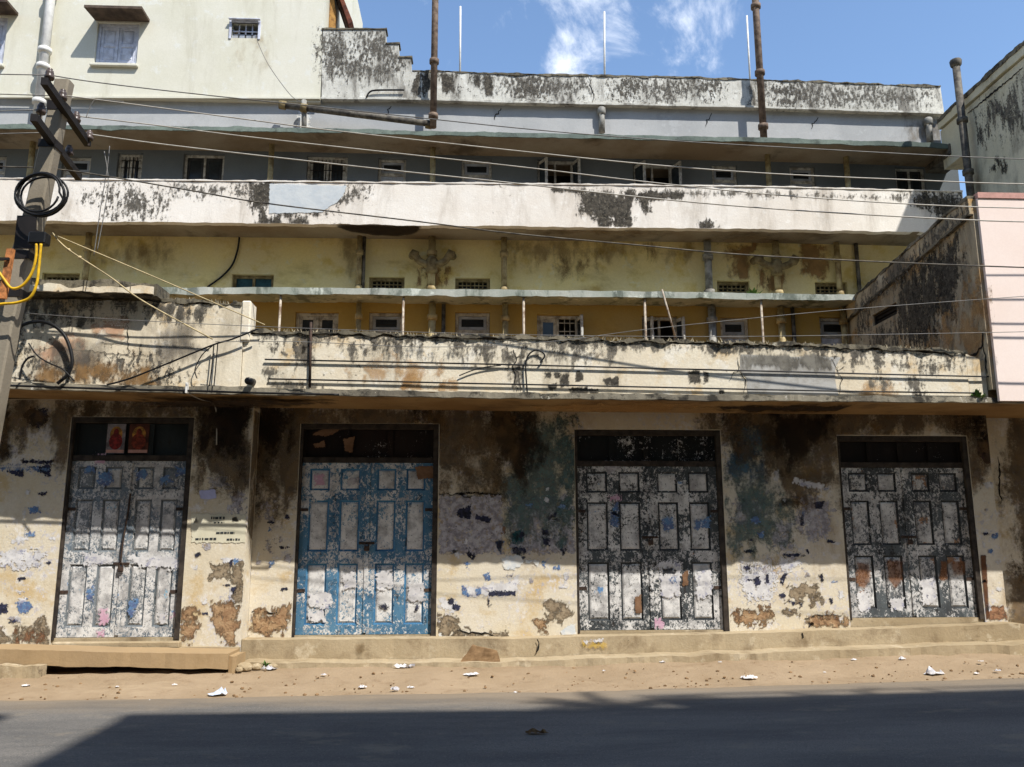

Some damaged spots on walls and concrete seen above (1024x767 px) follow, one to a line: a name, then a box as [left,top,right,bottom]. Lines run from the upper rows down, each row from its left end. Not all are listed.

water stain [72,28,943,139]
water stain [973,74,1024,150]
water stain [76,180,328,223]
water stain [257,187,974,396]
water stain [0,367,578,548]
water stain [696,404,1024,624]
spalling [0,615,51,645]
spalling [180,560,292,646]
spalling [531,598,575,636]
spalling [730,573,850,630]
spalling [989,605,1008,620]